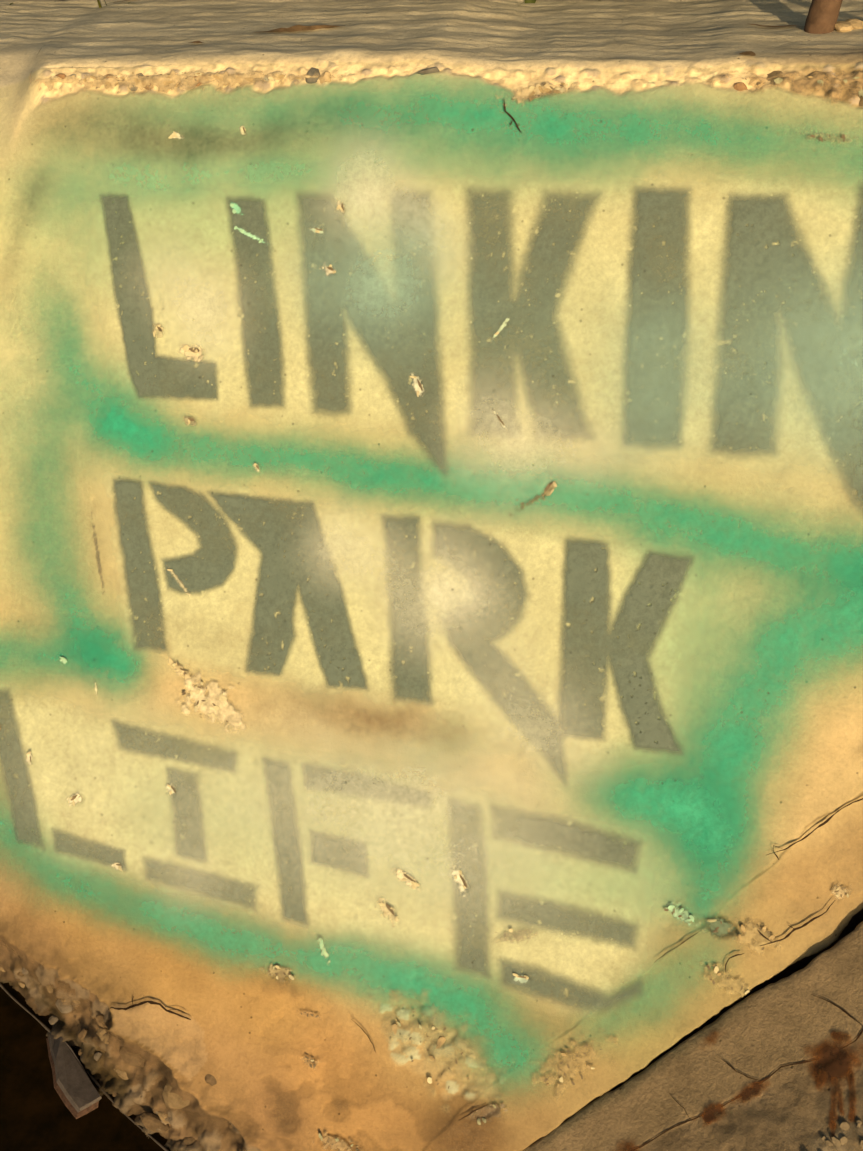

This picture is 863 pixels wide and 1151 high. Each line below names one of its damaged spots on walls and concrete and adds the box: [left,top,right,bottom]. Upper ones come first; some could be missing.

spalling [29,67,345,93]
spalling [416,67,440,75]
spalling [505,82,579,106]
peeling [169,658,245,732]
crack [767,798,863,860]
crack [725,902,834,972]
spalling [78,1014,145,1080]
crack [110,996,191,1020]
crack [811,994,863,1048]
spalling [140,1082,190,1132]
crack [636,1056,815,1149]
rust [812,1032,859,1138]